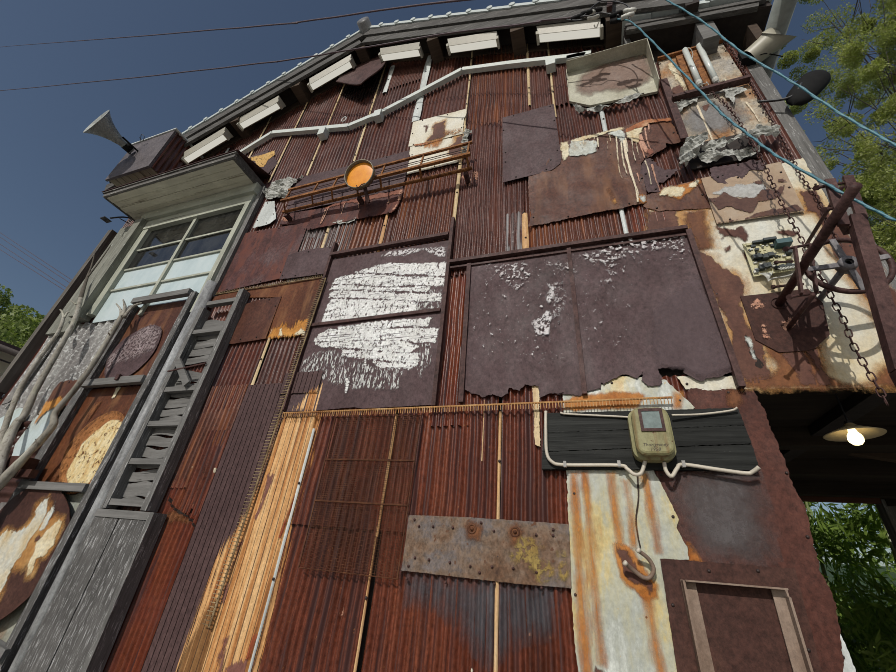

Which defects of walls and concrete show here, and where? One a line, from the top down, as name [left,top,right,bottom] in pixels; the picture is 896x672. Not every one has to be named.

rust [414,120,463,160]
rust [796,190,830,226]
peeling [584,238,685,282]
peeling [487,262,575,355]
rust [647,209,895,407]
rust [565,391,644,411]
peeling [61,412,123,484]
peeling [176,247,446,672]
peeling [0,498,64,594]
rust [509,471,605,672]
rust [609,474,663,672]